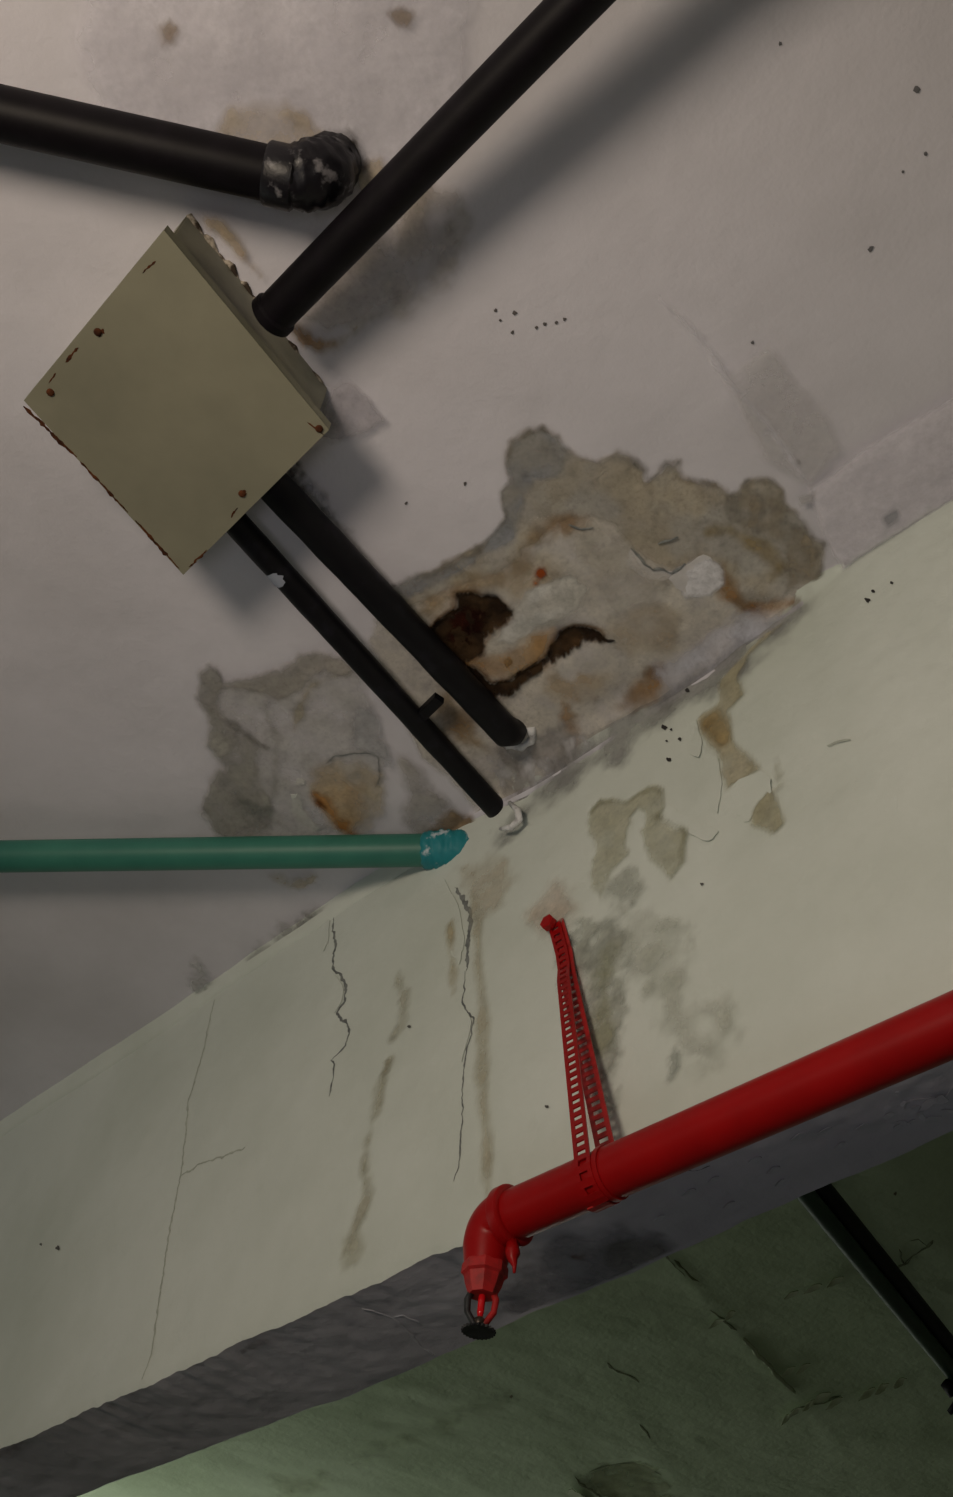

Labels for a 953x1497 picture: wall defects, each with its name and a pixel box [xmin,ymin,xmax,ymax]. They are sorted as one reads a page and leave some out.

spalling [431,592,615,697]
damp [371,431,823,841]
peeling [626,549,714,597]
rust [313,774,360,835]
damp [589,788,685,897]
peeling [665,721,772,841]
crack [318,918,351,1096]
crack [445,881,475,1181]
damp [530,885,681,1113]
crack [142,1000,245,1378]